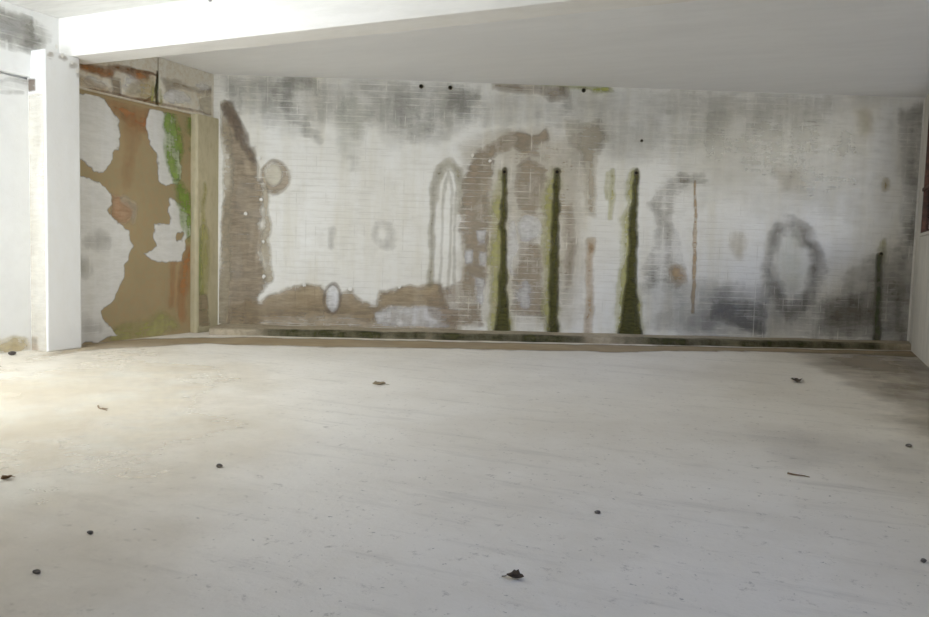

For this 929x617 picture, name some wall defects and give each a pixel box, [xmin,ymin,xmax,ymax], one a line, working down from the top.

peeling [146,109,182,186]
peeling [80,93,133,344]
peeling [144,198,190,262]
peeling [219,101,548,330]
leakage [827,258,906,332]